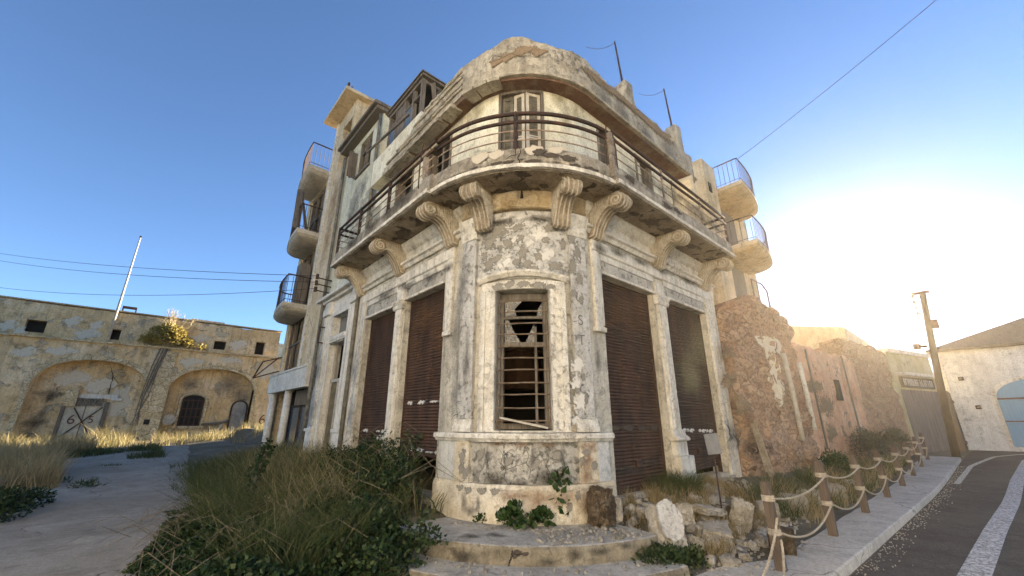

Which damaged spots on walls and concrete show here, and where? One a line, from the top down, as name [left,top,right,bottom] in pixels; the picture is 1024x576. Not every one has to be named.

spalling [488,45,549,67]
spalling [451,145,599,178]
peeling [479,218,584,305]
peeling [568,353,588,425]
peeling [755,336,785,407]
crack [485,448,565,484]